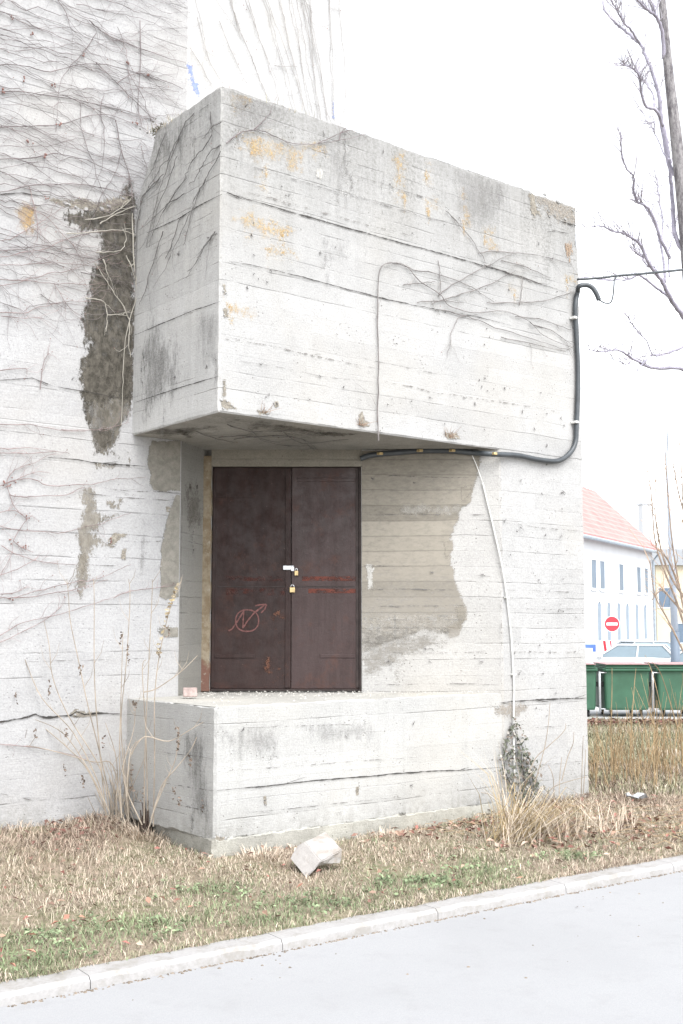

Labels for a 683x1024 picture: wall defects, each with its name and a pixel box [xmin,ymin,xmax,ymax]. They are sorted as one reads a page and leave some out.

spalling [48,196,130,212]
spalling [529,193,578,226]
peeling [147,440,181,600]